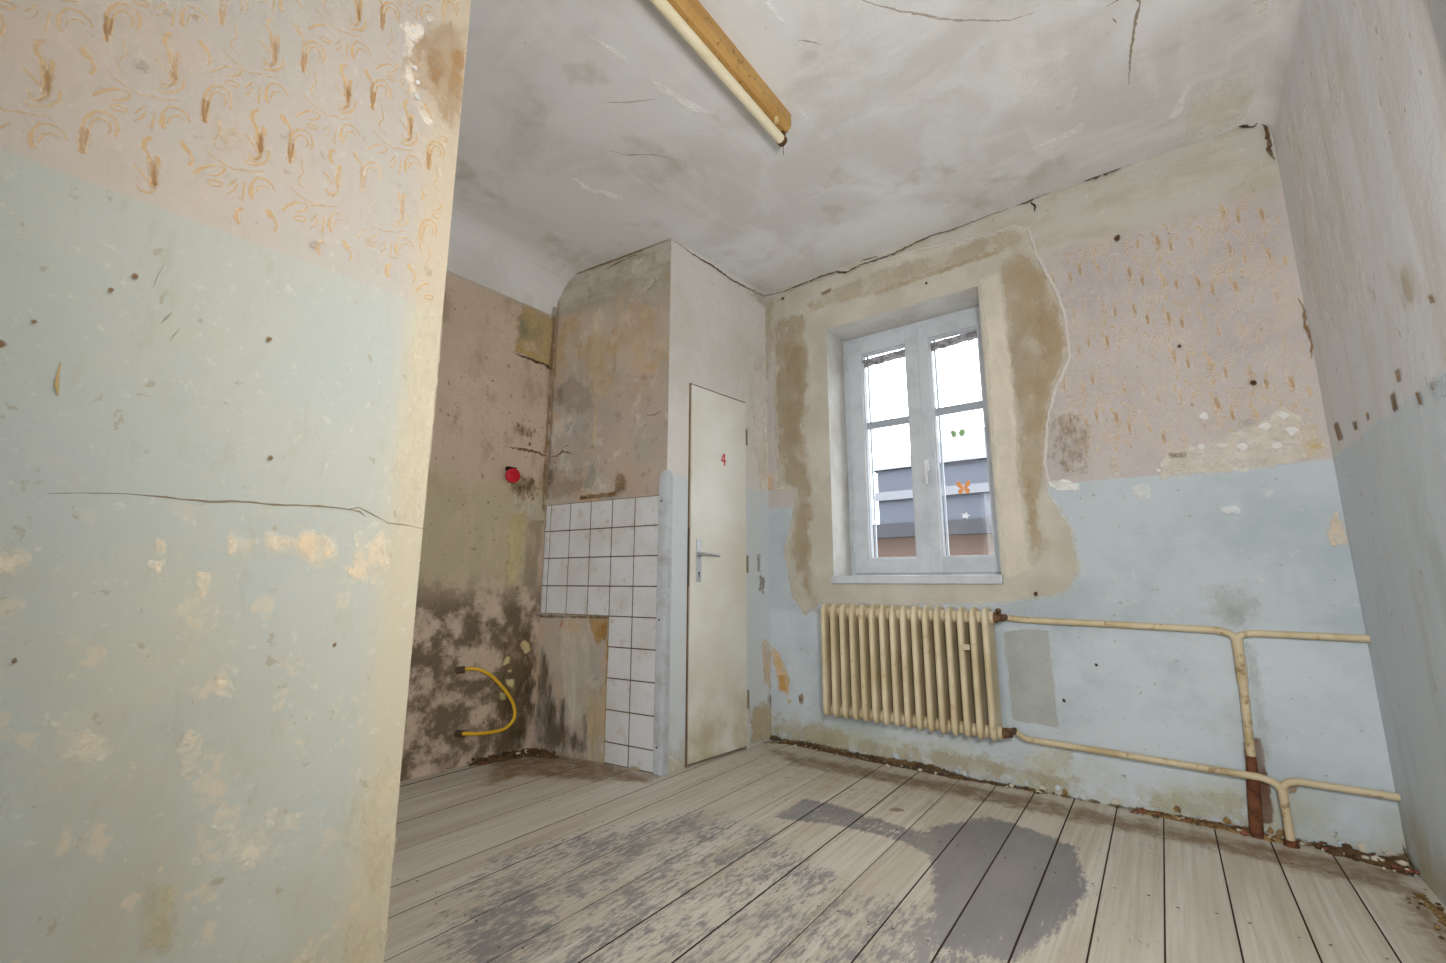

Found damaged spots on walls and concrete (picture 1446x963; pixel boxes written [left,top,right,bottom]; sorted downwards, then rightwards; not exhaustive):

peeling [403,18,432,124]
crack [863,0,1032,22]
crack [1106,0,1141,75]
peeling [773,225,1081,614]
crack [47,493,427,530]
damp [497,632,605,752]
corrosion [1244,738,1273,824]